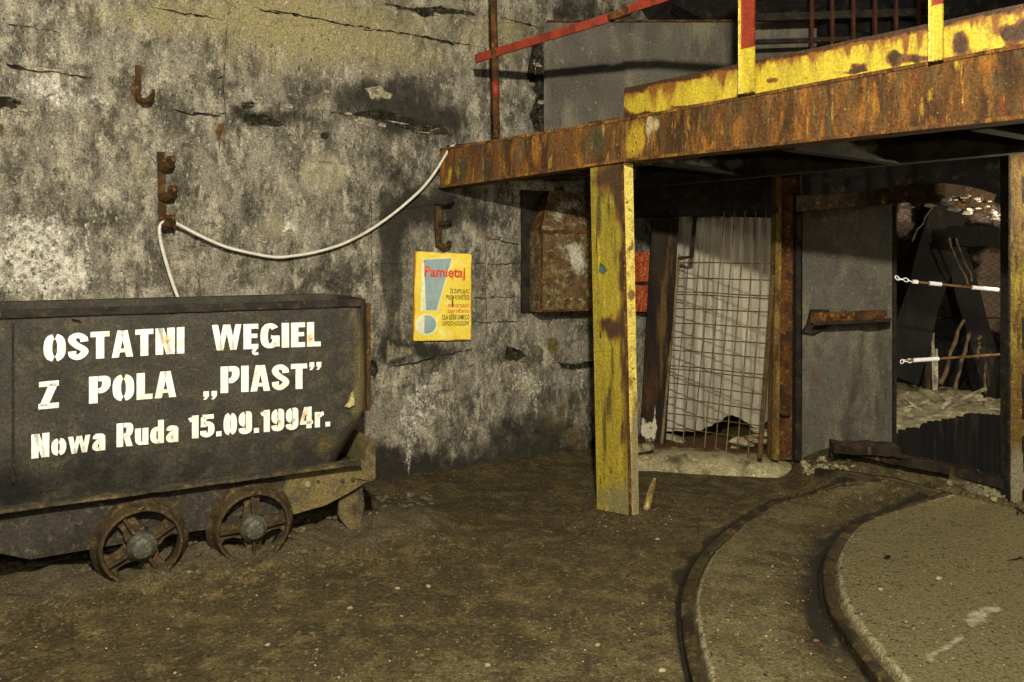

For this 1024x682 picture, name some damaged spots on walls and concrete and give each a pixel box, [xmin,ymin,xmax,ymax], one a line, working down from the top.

crack [6,63,89,79]
crack [151,3,487,120]
spalling [315,85,451,136]
damp [510,368,541,420]
damp [401,381,450,474]